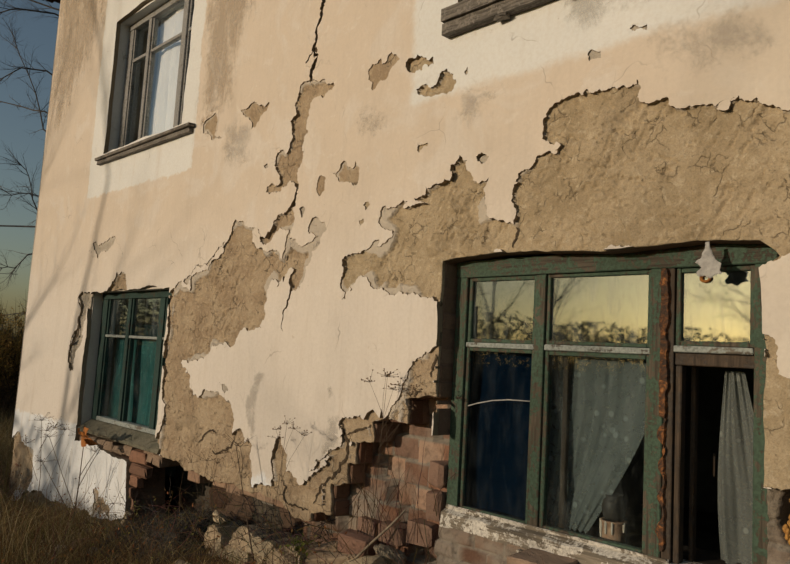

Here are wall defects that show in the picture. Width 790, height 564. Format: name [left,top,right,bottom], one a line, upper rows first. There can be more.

flaking render [369,54,400,90]
flaking render [409,57,434,73]
flaking render [417,70,456,97]
flaking render [242,102,269,127]
flaking render [341,81,790,306]
flaking render [94,237,116,257]
flaking render [111,273,129,291]
flaking render [69,293,95,368]
flaking render [158,207,442,522]
flaking render [8,432,33,498]
flaking render [763,334,790,564]
flaking render [434,526,526,564]